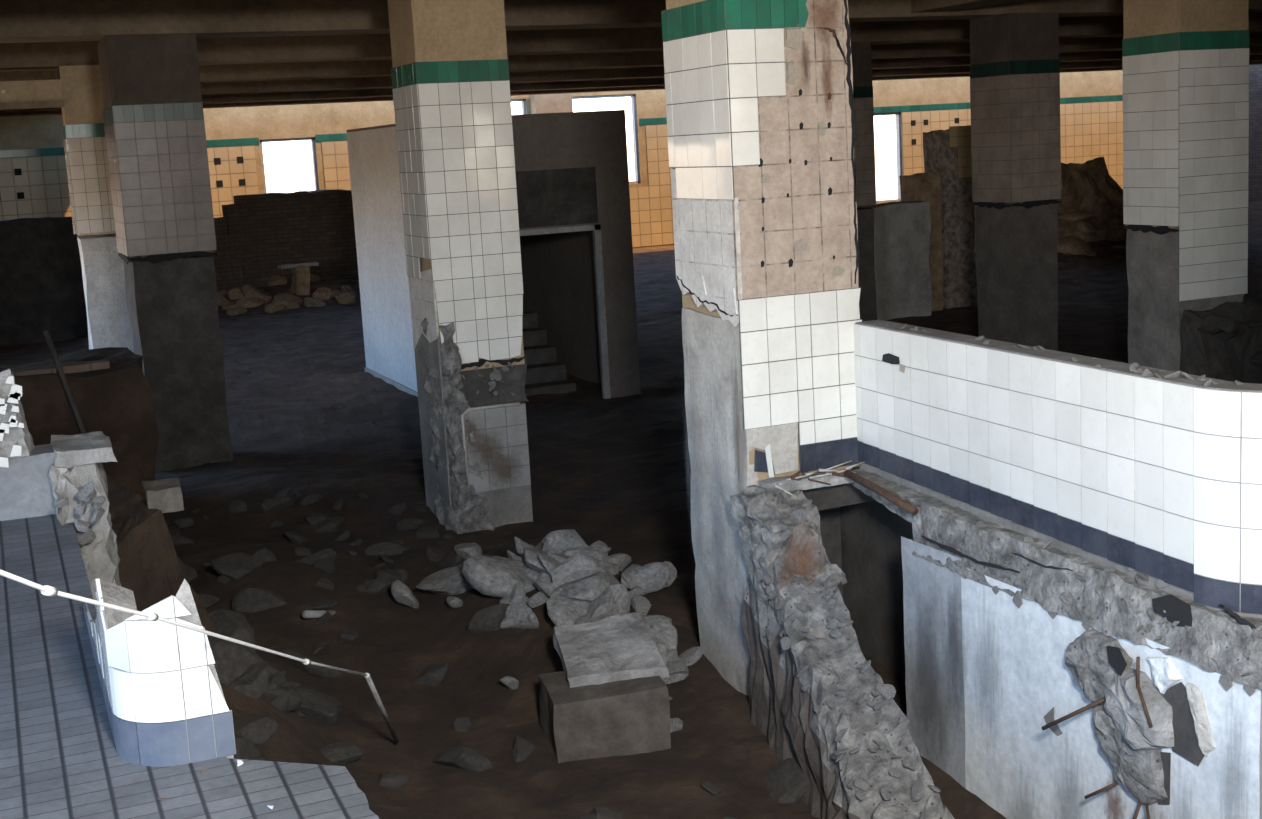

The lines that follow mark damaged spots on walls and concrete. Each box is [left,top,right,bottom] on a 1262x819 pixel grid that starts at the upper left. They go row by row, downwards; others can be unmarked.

spalling [670,0,859,327]
crack [824,0,860,284]
spalling [408,269,529,534]
rust [844,470,918,515]
spalling [769,467,1262,819]